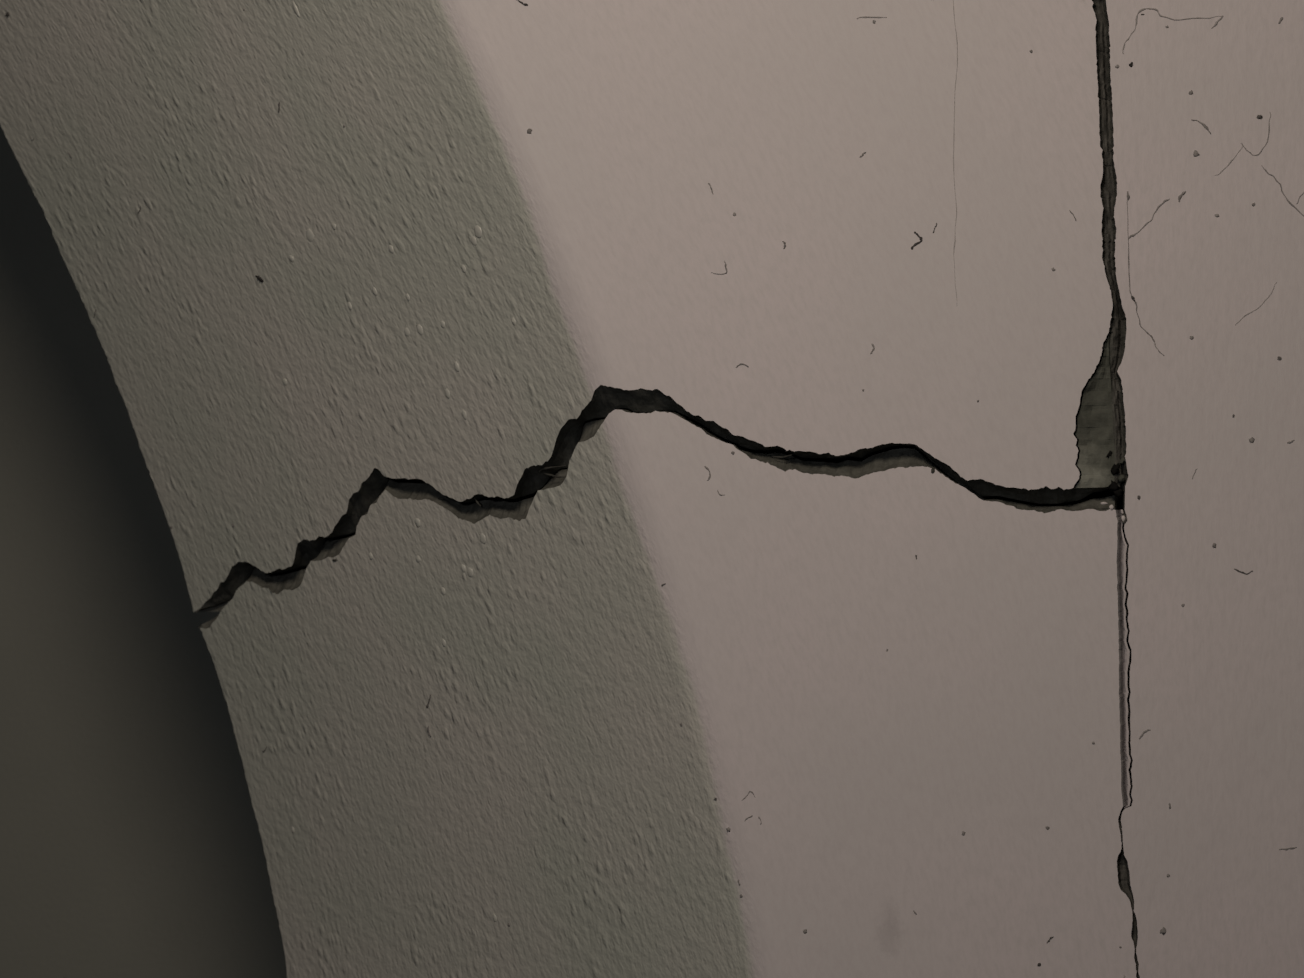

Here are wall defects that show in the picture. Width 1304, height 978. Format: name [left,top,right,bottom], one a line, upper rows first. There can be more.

crack [195,0,1164,978]